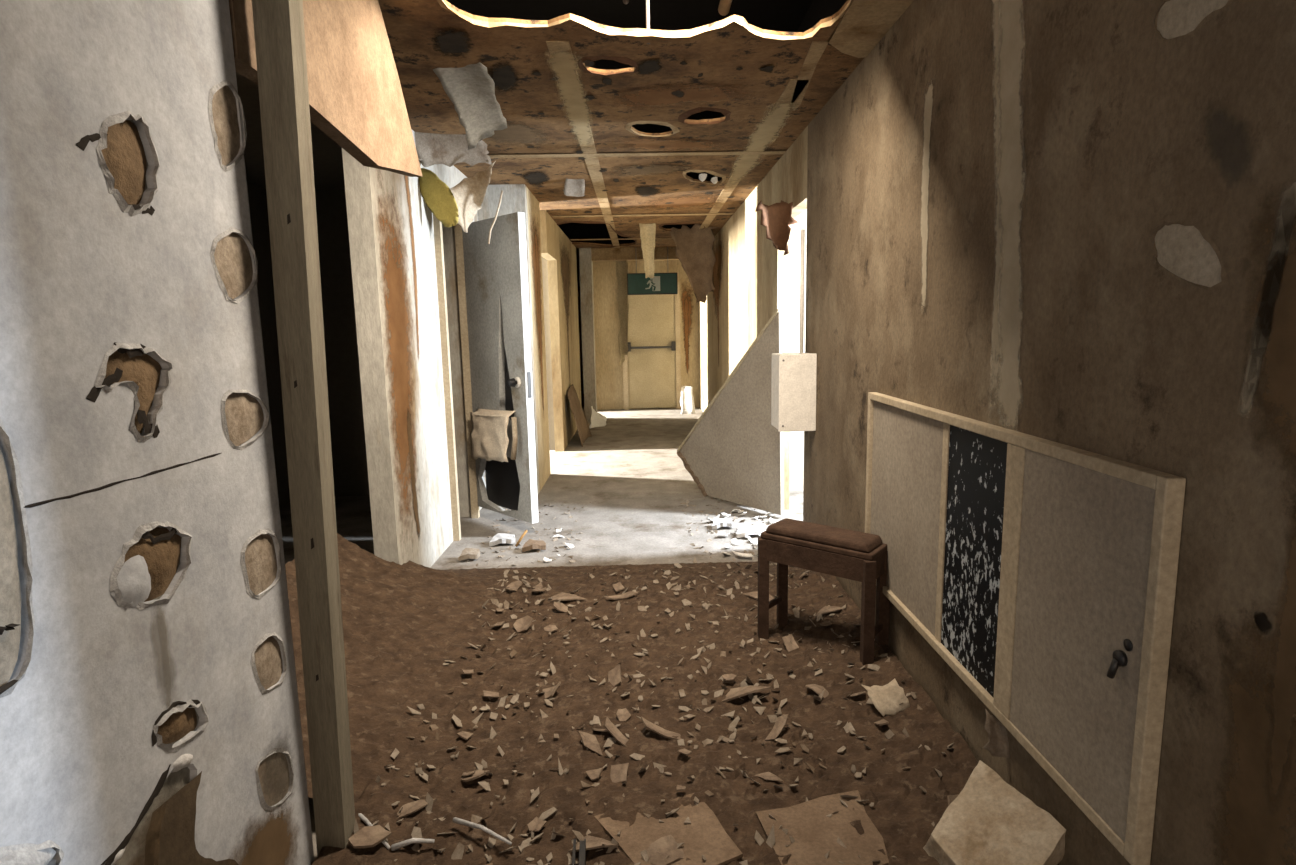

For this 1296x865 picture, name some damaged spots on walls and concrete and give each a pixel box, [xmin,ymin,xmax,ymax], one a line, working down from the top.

spalling [437,0,854,40]
flaking render [76,110,160,217]
flaking render [87,342,174,442]
flaking render [0,417,35,698]
flaking render [0,840,64,865]